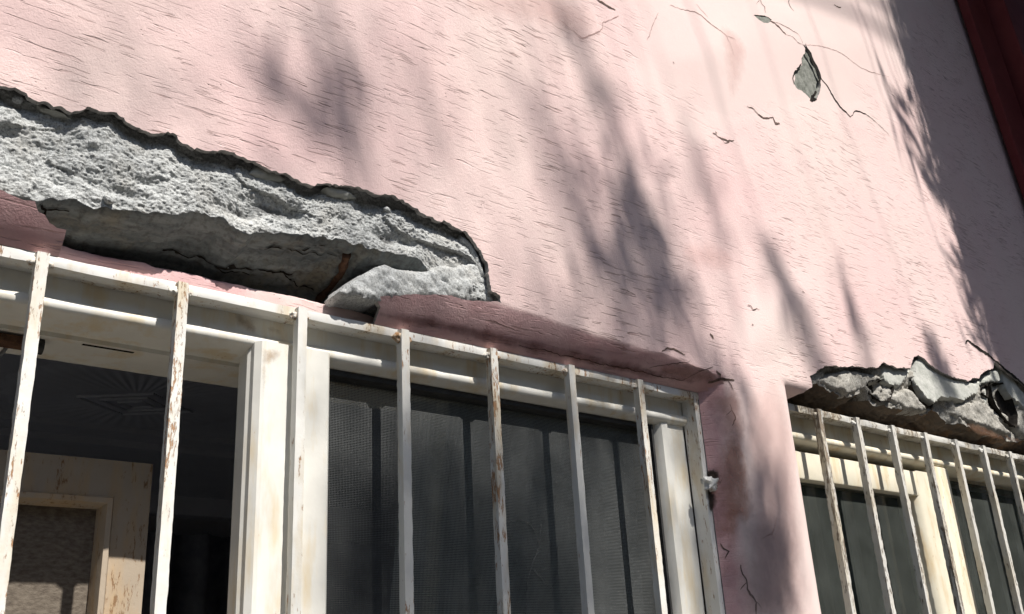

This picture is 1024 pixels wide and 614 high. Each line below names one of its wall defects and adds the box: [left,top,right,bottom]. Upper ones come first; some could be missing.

crack [647,5,736,56]
spalling [794,50,819,98]
crack [758,1,889,125]
spalling [0,89,498,318]
crack [163,245,335,290]
spalling [787,357,1024,455]